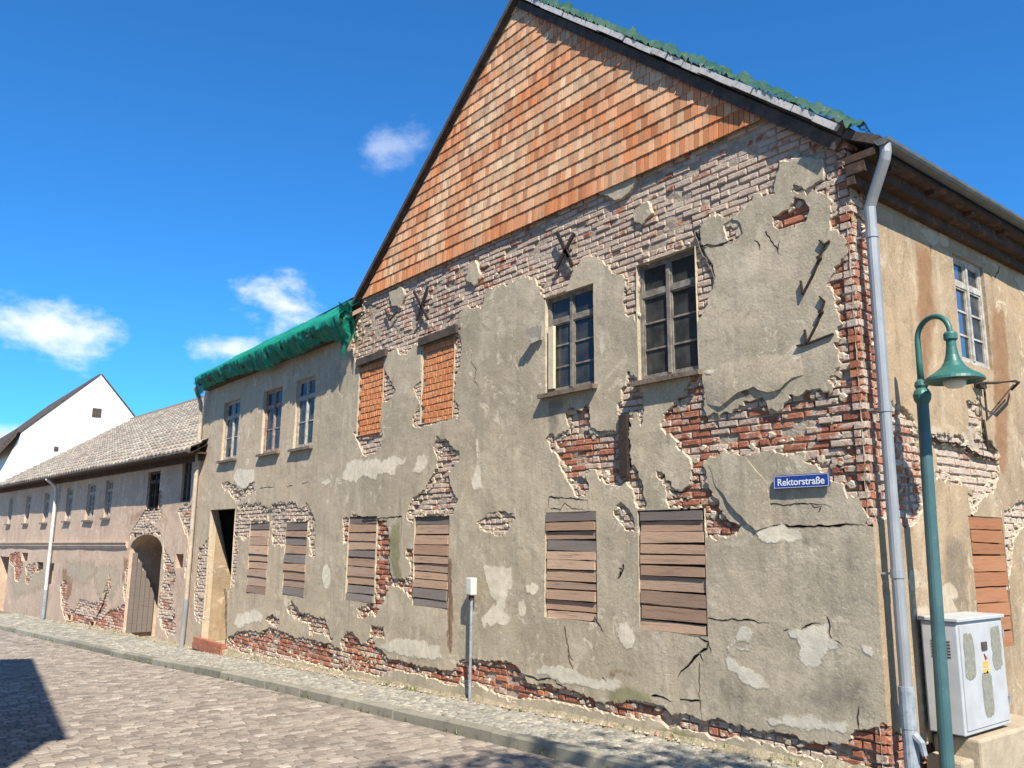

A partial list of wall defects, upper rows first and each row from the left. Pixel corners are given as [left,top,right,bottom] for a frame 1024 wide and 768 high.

spalling [221,119,1000,768]
flaking render [9,552,45,599]
spalling [60,559,130,632]
spalling [129,490,211,639]
spalling [1000,499,1024,590]
crack [651,617,842,718]